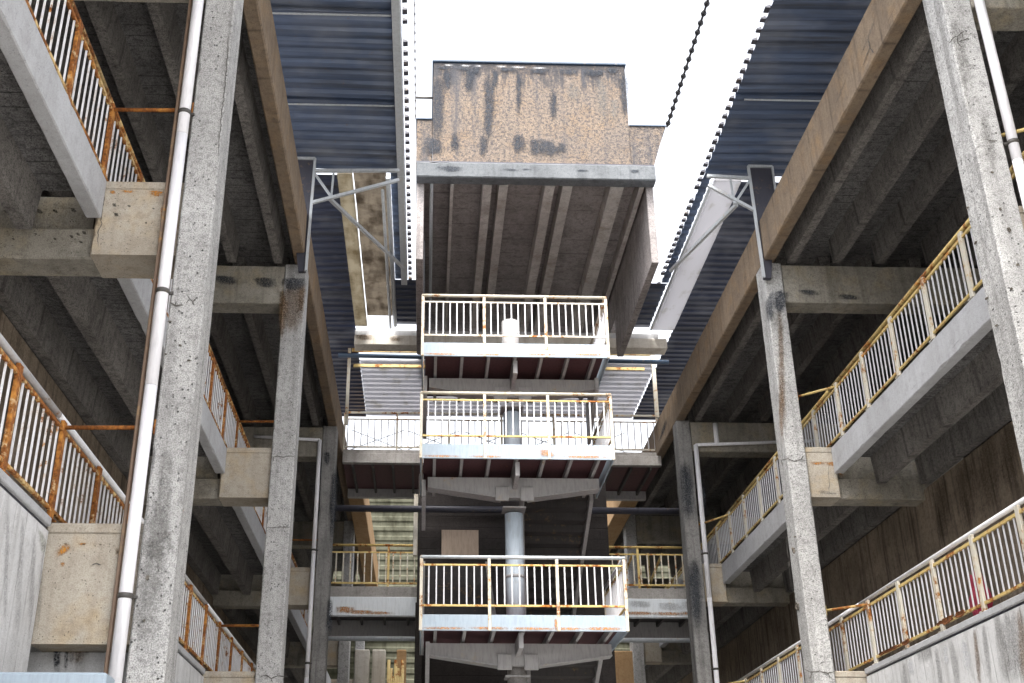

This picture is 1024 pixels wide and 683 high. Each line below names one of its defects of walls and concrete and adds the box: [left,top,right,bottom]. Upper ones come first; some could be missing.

damp [425,66,521,154]
damp [531,68,629,112]
damp [514,135,565,155]